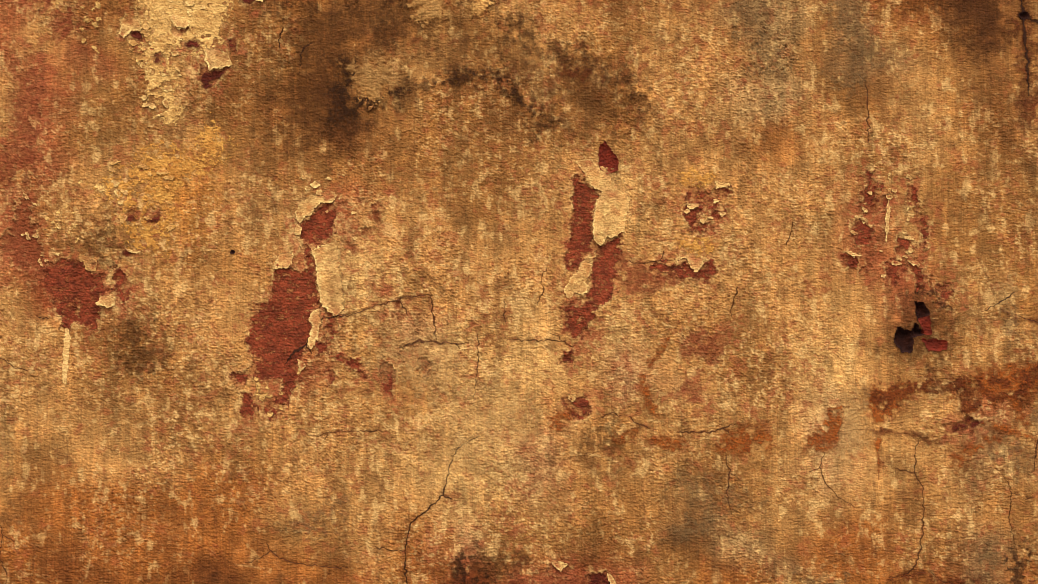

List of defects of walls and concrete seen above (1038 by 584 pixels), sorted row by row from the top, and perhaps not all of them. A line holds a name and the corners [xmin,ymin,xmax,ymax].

peeling [118,0,237,117]
leakage [327,58,373,123]
leakage [434,71,536,113]
crack [1021,0,1038,96]
peeling [95,159,175,232]
peeling [682,181,733,234]
peeling [37,248,143,333]
peeling [229,174,396,421]
peeling [557,159,631,372]
peeling [649,253,720,284]
peeling [841,170,954,351]
peeling [588,572,616,584]